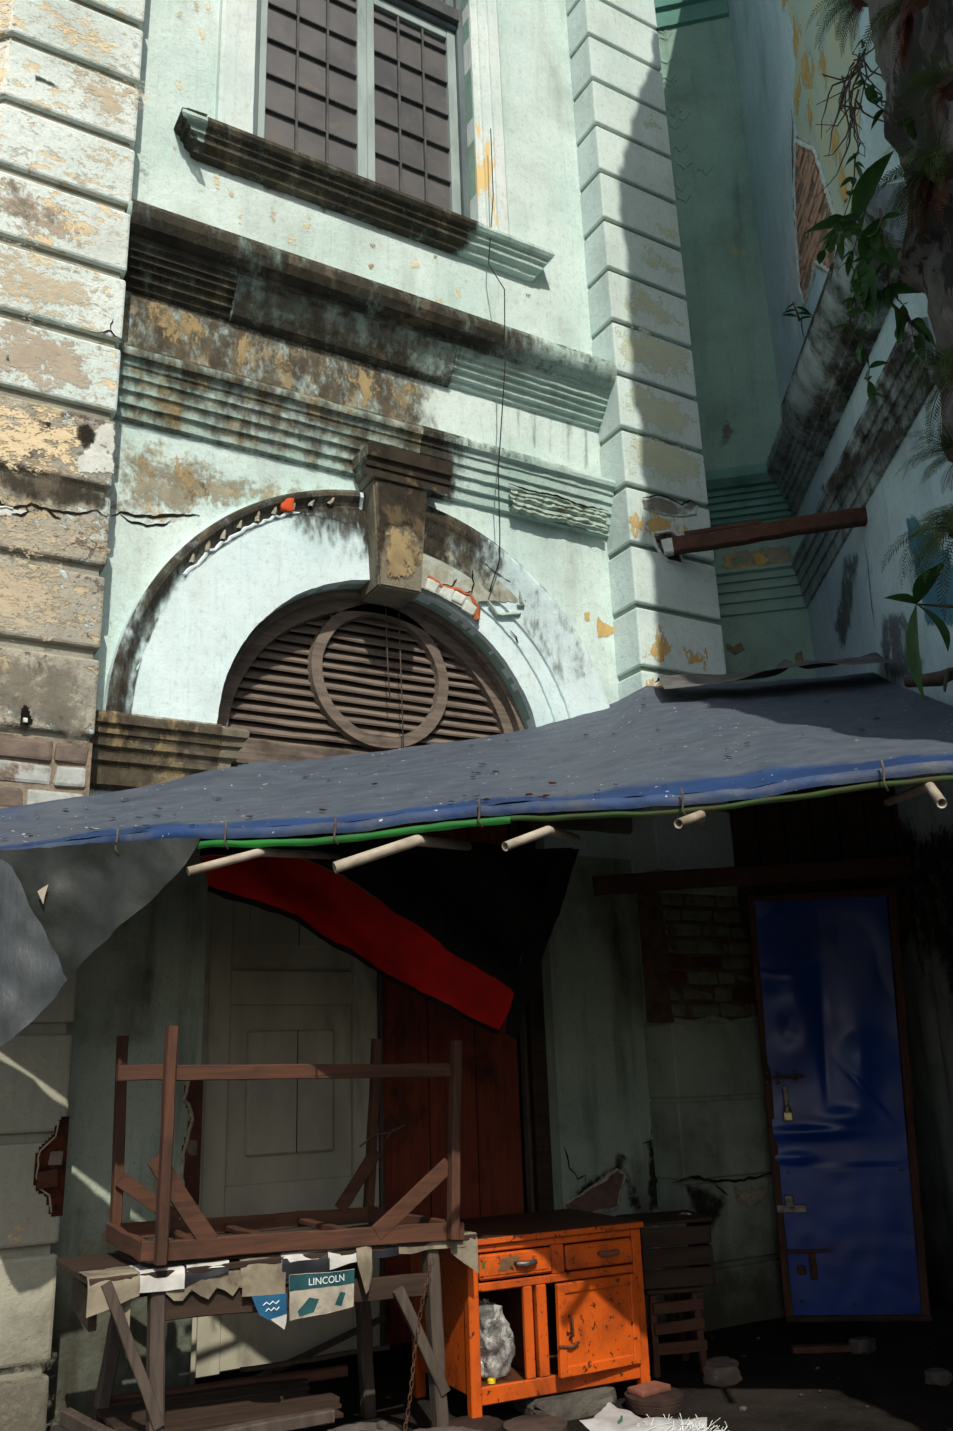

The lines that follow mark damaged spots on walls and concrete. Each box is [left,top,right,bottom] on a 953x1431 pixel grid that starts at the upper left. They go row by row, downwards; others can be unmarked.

peeling [782,0,861,308]
peeling [0,177,115,476]
peeling [614,224,705,566]
leakage [766,211,935,510]
peeling [0,506,110,641]
crack [0,500,200,527]
leakage [88,199,603,792]
peeling [584,612,614,650]
flaking render [0,657,93,809]
leakage [899,820,953,994]
crack [564,1146,586,1181]
crack [672,1171,772,1195]